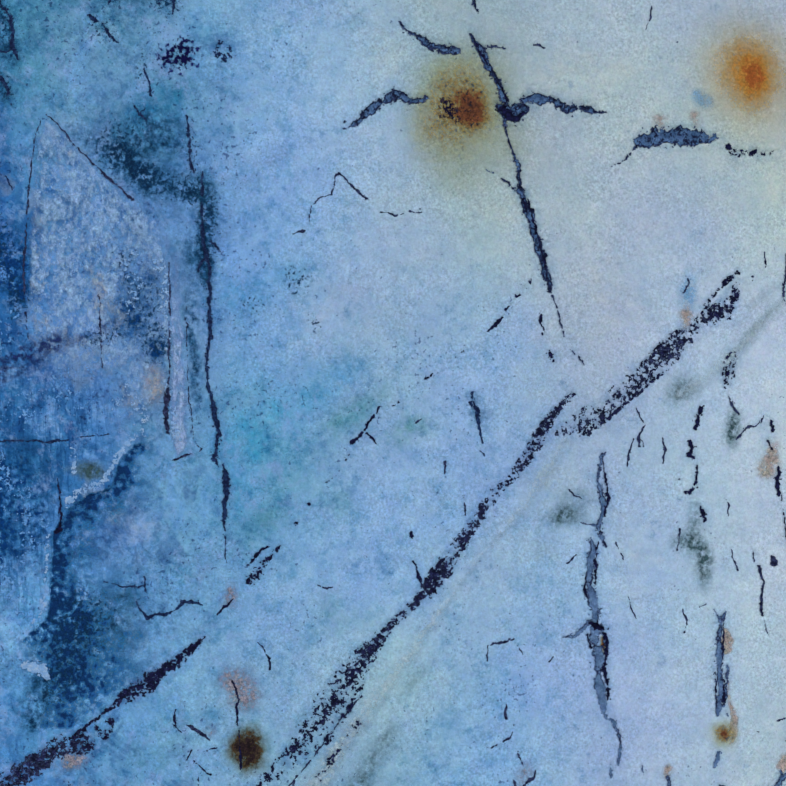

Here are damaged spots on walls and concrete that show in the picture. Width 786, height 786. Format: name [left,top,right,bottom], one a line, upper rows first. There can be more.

crack [342,86,428,130]
rust [424,65,492,147]
rust [717,37,781,111]
crack [398,21,607,364]
crack [162,115,231,563]
peeling [0,122,206,786]
crack [678,405,707,522]
crack [103,576,234,620]
crack [563,452,624,778]
crack [682,604,730,717]
rust [228,727,264,771]
rust [715,725,732,742]